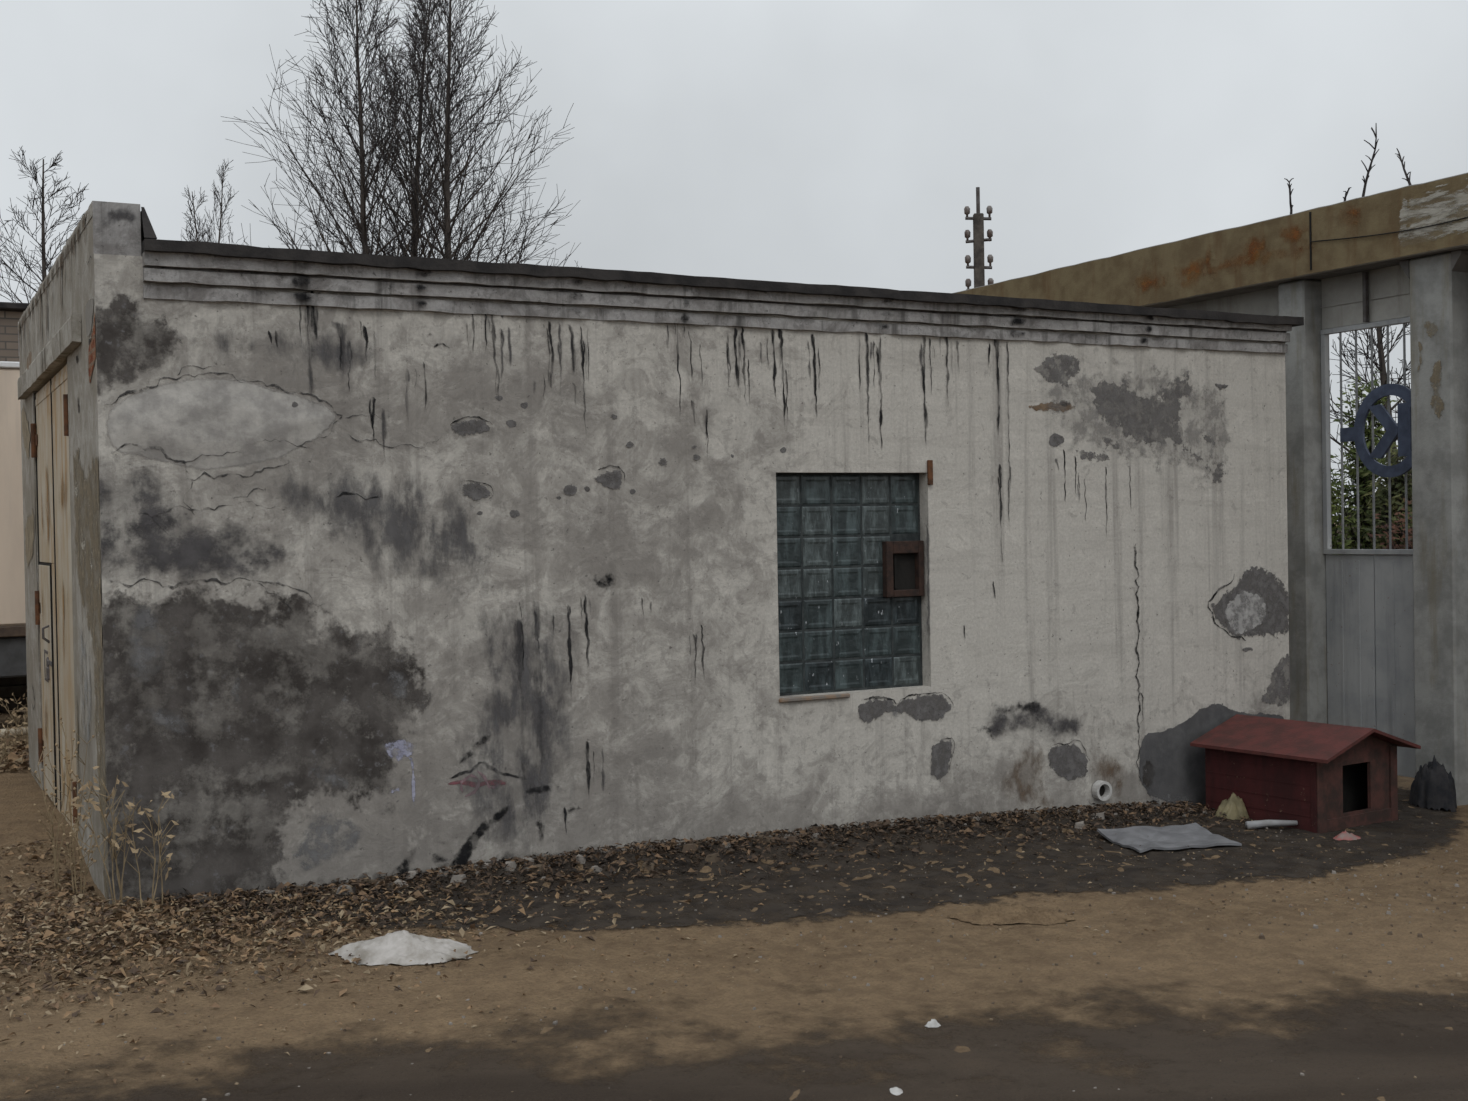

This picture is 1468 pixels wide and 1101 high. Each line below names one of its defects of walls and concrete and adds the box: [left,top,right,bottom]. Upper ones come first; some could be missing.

peeling [1398,178,1468,242]
spalling [1029,354,1080,412]
crack [114,365,434,528]
spalling [1049,374,1226,483]
crack [110,577,321,615]
spalling [1208,566,1289,652]
flaking render [73,448,108,903]
leakage [81,474,431,903]
spalling [858,692,954,723]
spalling [1261,654,1290,706]
spalling [931,738,955,782]
spalling [1048,742,1090,780]